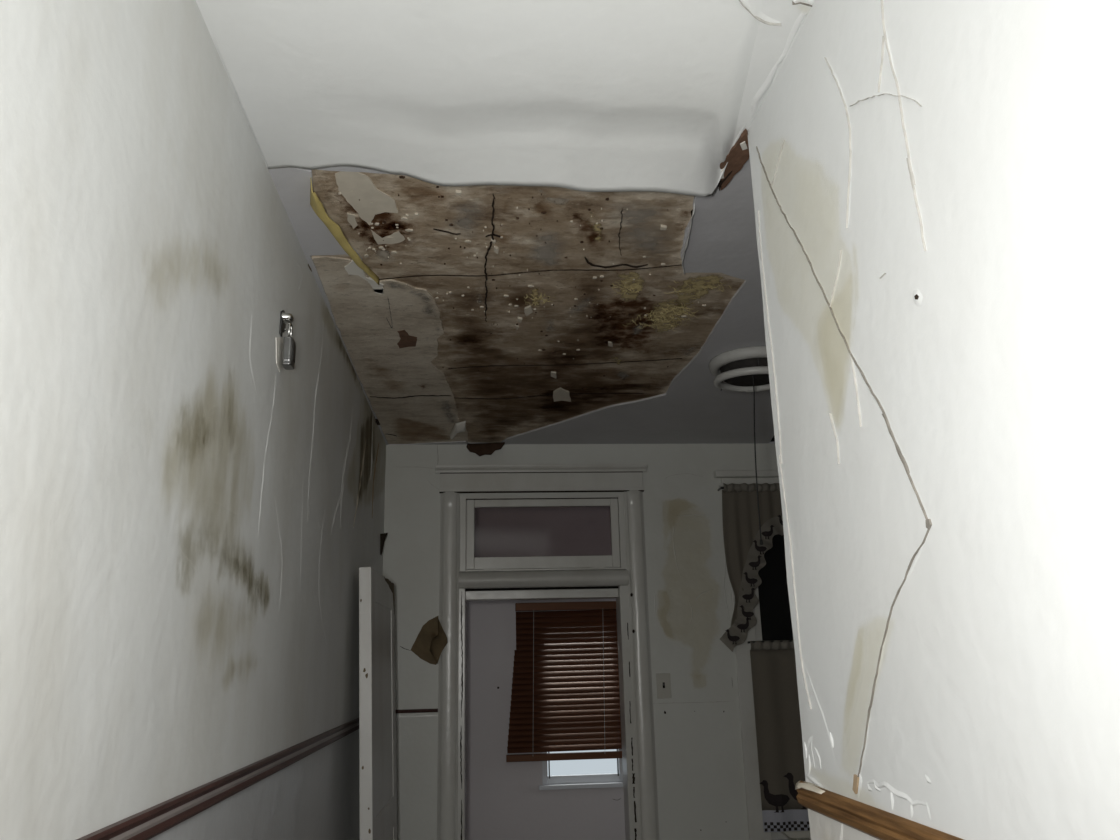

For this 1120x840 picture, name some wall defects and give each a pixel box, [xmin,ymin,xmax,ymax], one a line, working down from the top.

flaking render [312,256,468,444]
flaking render [551,371,584,402]
crack [756,0,930,798]
flaking render [400,615,447,665]